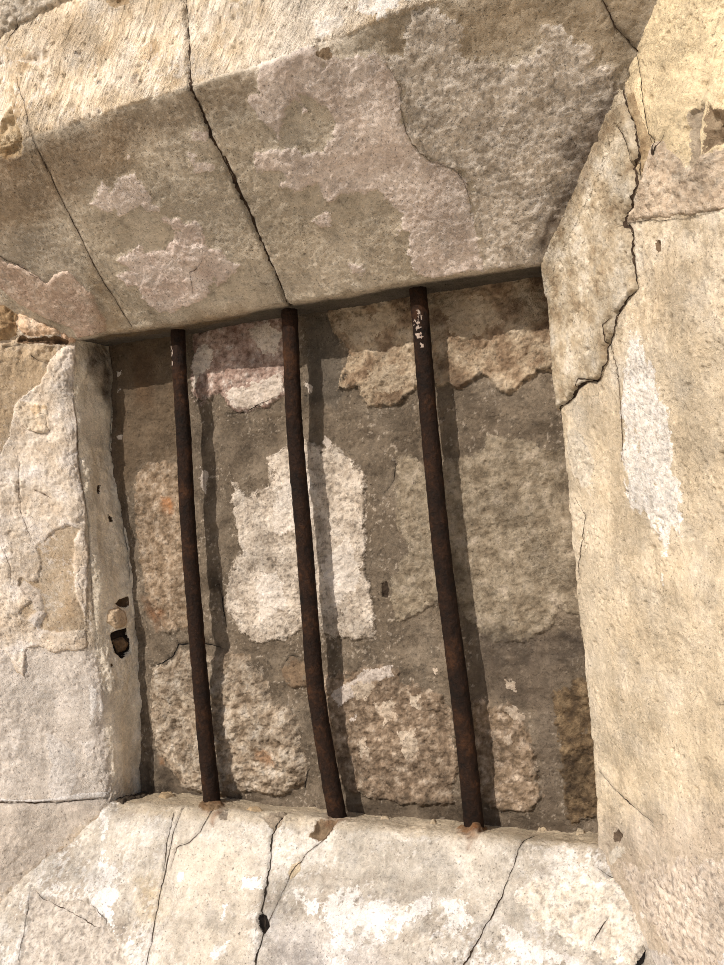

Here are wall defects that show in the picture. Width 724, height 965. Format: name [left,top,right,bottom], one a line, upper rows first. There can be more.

crack [186,0,291,306]
peeling [244,0,617,281]
crack [559,0,716,462]
peeling [413,288,508,351]
peeling [266,469,296,542]
peeling [306,461,323,525]
peeling [249,565,292,627]
peeling [315,532,367,613]
crack [146,808,212,965]
crack [254,818,332,965]
rust [321,813,352,835]
crack [463,836,535,965]